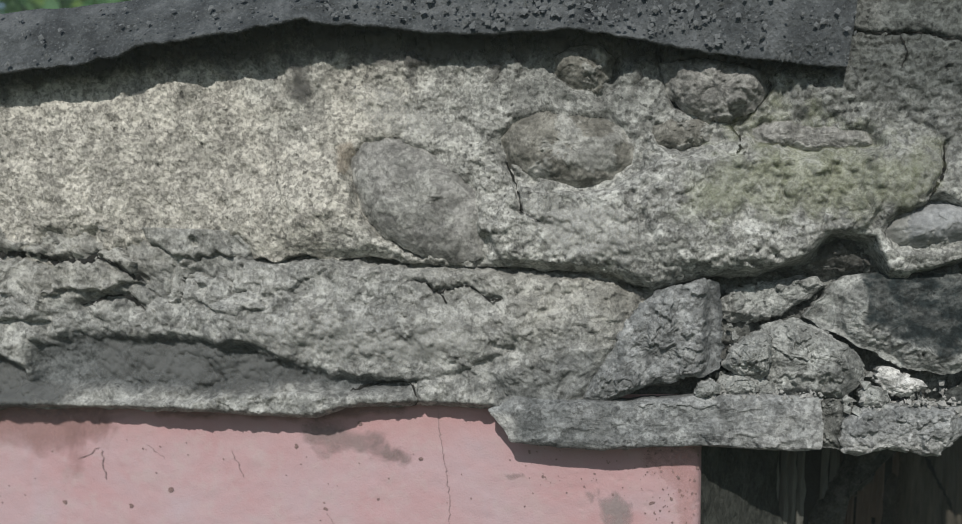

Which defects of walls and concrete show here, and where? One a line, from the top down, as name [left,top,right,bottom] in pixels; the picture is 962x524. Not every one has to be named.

crack [857,30,961,67]
crack [407,279,501,304]
crack [351,381,418,407]
crack [438,413,451,524]